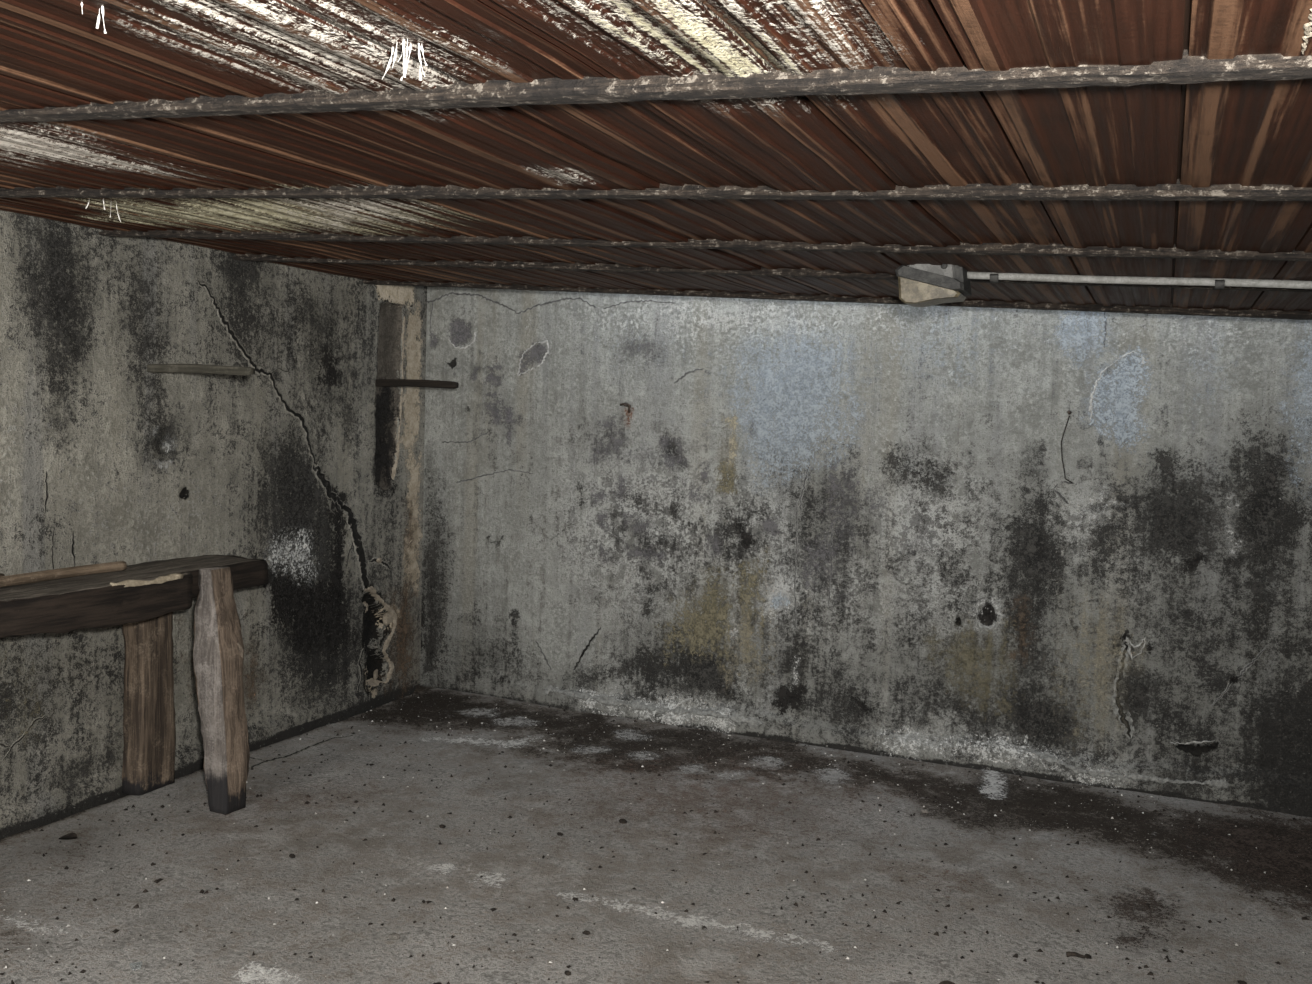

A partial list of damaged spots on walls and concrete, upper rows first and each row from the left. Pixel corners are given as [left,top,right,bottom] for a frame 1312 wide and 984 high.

damp [0,122,199,178]
damp [12,183,480,460]
damp [40,730,123,814]
crack [196,280,369,595]
damp [243,283,362,720]
spalling [357,584,407,698]
damp [463,708,537,726]
damp [575,415,673,564]
damp [642,415,808,716]
damp [802,440,952,603]
damp [894,438,1312,816]
flaking render [1111,629,1218,756]